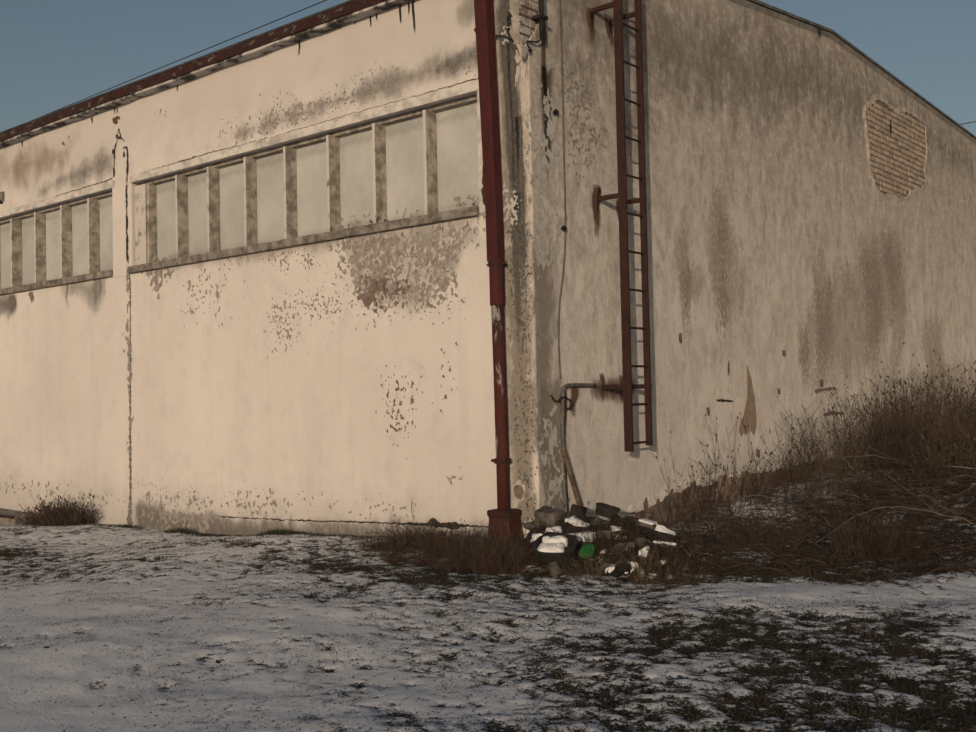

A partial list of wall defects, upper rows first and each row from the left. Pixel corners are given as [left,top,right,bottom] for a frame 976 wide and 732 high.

damp [198,62,402,152]
flaking render [862,93,928,205]
peeling [122,268,133,398]
crack [47,78,488,530]
peeling [141,194,486,359]
peeling [371,365,423,460]
corrosion [542,381,579,510]
corrosion [594,374,634,401]
flaking render [739,366,757,437]